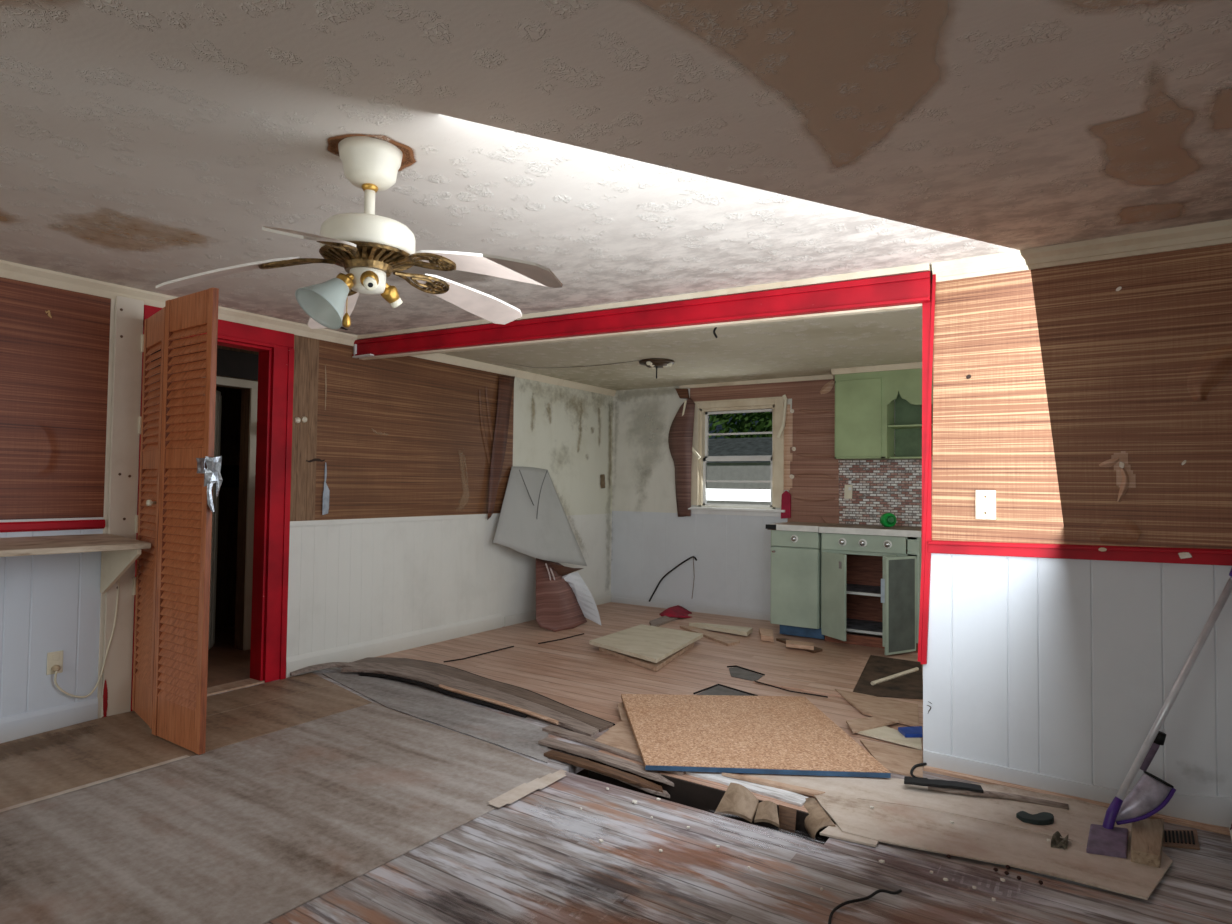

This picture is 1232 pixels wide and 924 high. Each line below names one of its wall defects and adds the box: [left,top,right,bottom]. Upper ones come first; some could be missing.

peeling [675,388,689,399]